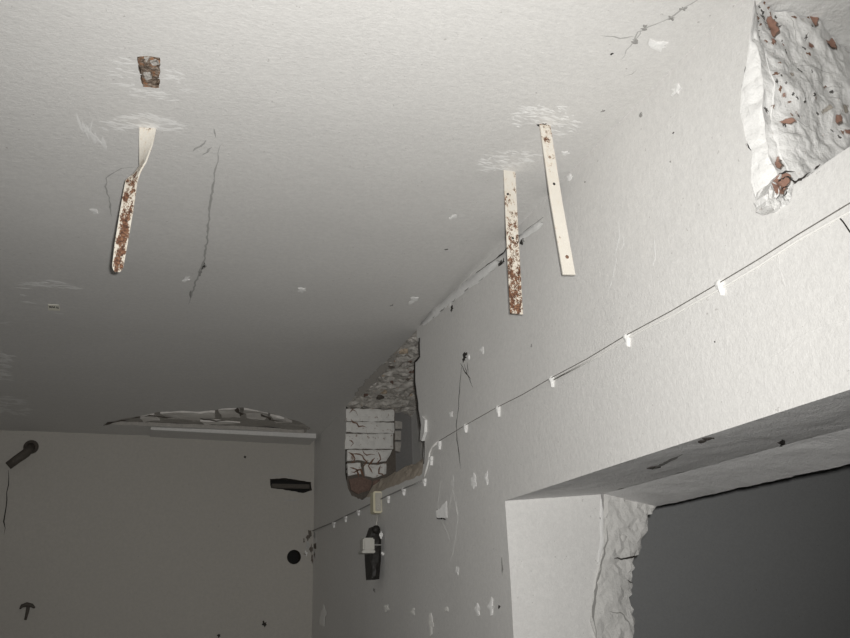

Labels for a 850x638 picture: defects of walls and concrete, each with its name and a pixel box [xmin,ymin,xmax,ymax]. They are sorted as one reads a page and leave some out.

rust [137,56,160,88]
crack [601,0,697,76]
crack [189,129,220,303]
spalling [103,407,310,433]
spalling [344,330,427,500]